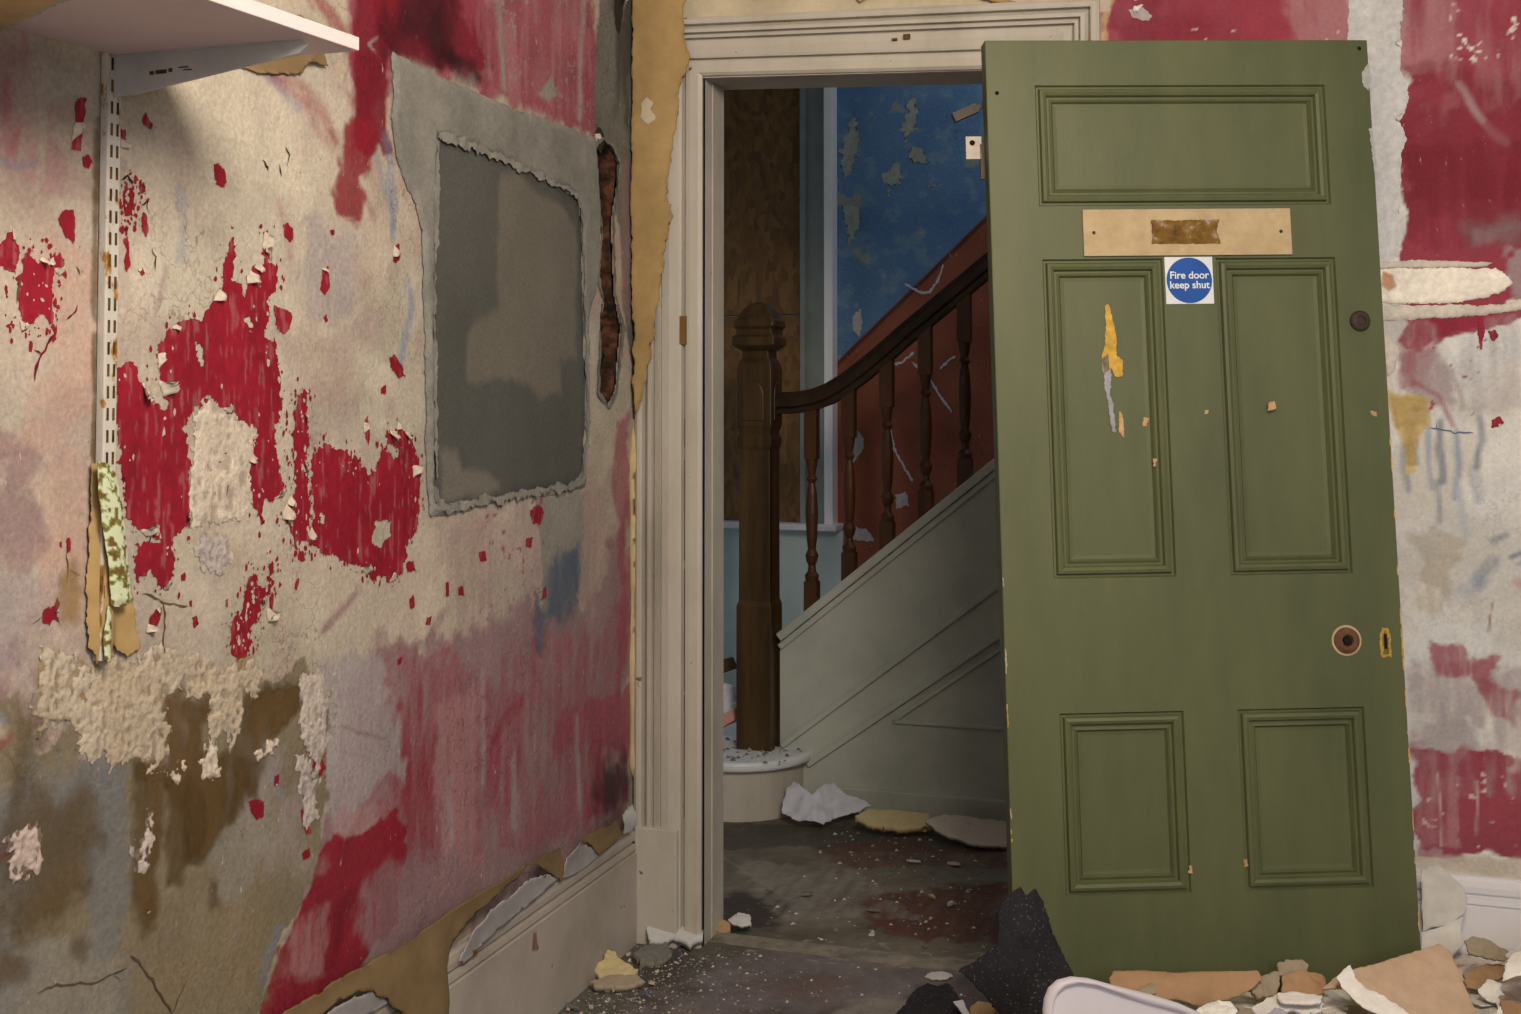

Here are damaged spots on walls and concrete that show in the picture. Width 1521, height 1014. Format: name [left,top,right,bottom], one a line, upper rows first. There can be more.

flaking render [595,134,627,409]
peeling [116,223,425,666]
peeling [1491,416,1504,428]
peeling [526,504,544,548]
damp [134,686,300,927]
peeling [249,799,265,820]
peeling [301,809,311,860]